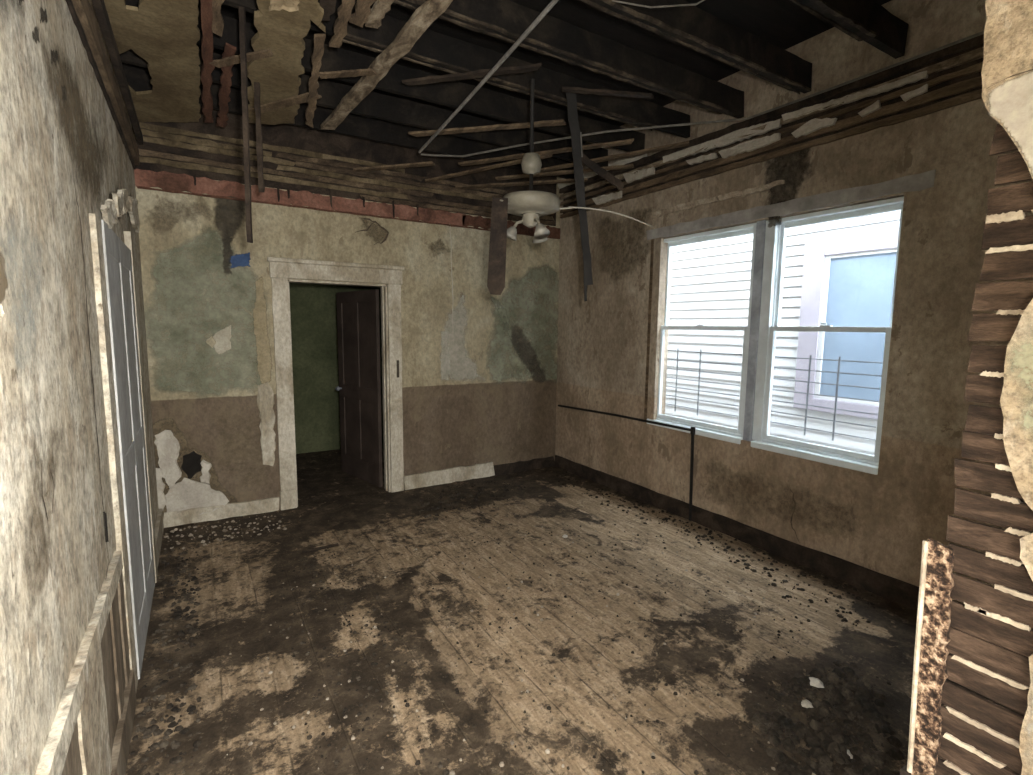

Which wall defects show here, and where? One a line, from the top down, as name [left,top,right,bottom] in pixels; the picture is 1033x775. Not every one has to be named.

flaking render [132,34,984,226]
peeling [0,254,8,320]
peeling [230,252,251,269]
spalling [206,325,232,354]
peeling [253,277,276,466]
spalling [153,419,238,515]
spalling [936,123,1033,775]